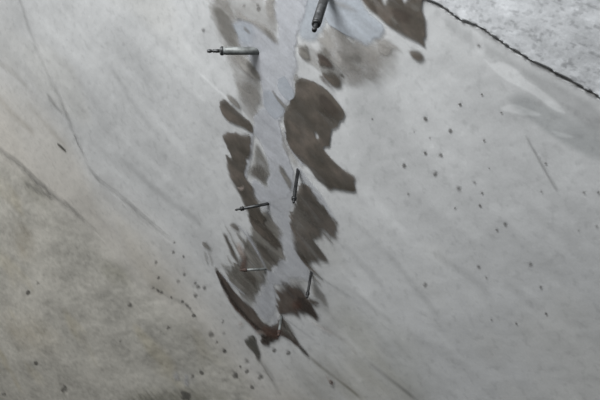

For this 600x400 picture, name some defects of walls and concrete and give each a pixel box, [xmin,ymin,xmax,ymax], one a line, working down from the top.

leakage [215,0,425,359]